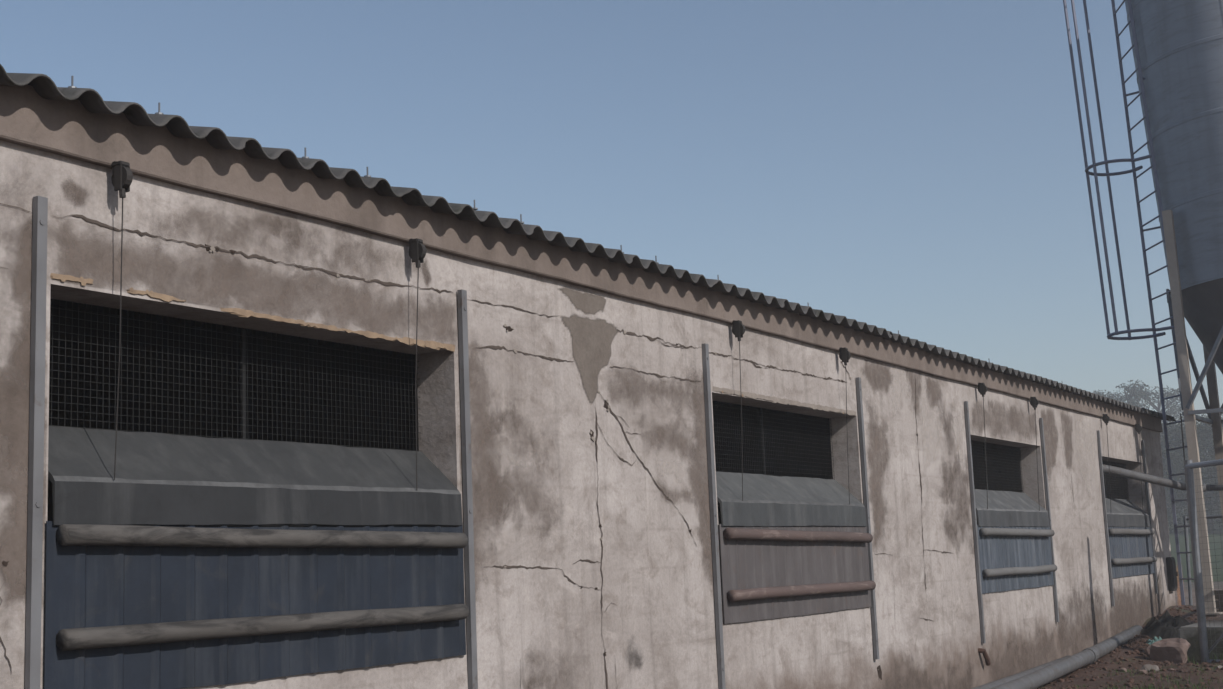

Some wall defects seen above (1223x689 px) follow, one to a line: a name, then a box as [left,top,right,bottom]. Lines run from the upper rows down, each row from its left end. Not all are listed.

crack [0,203,560,317]
damp [865,360,891,391]
damp [910,372,941,410]
crack [476,329,852,689]
damp [868,409,888,546]
damp [943,468,971,538]